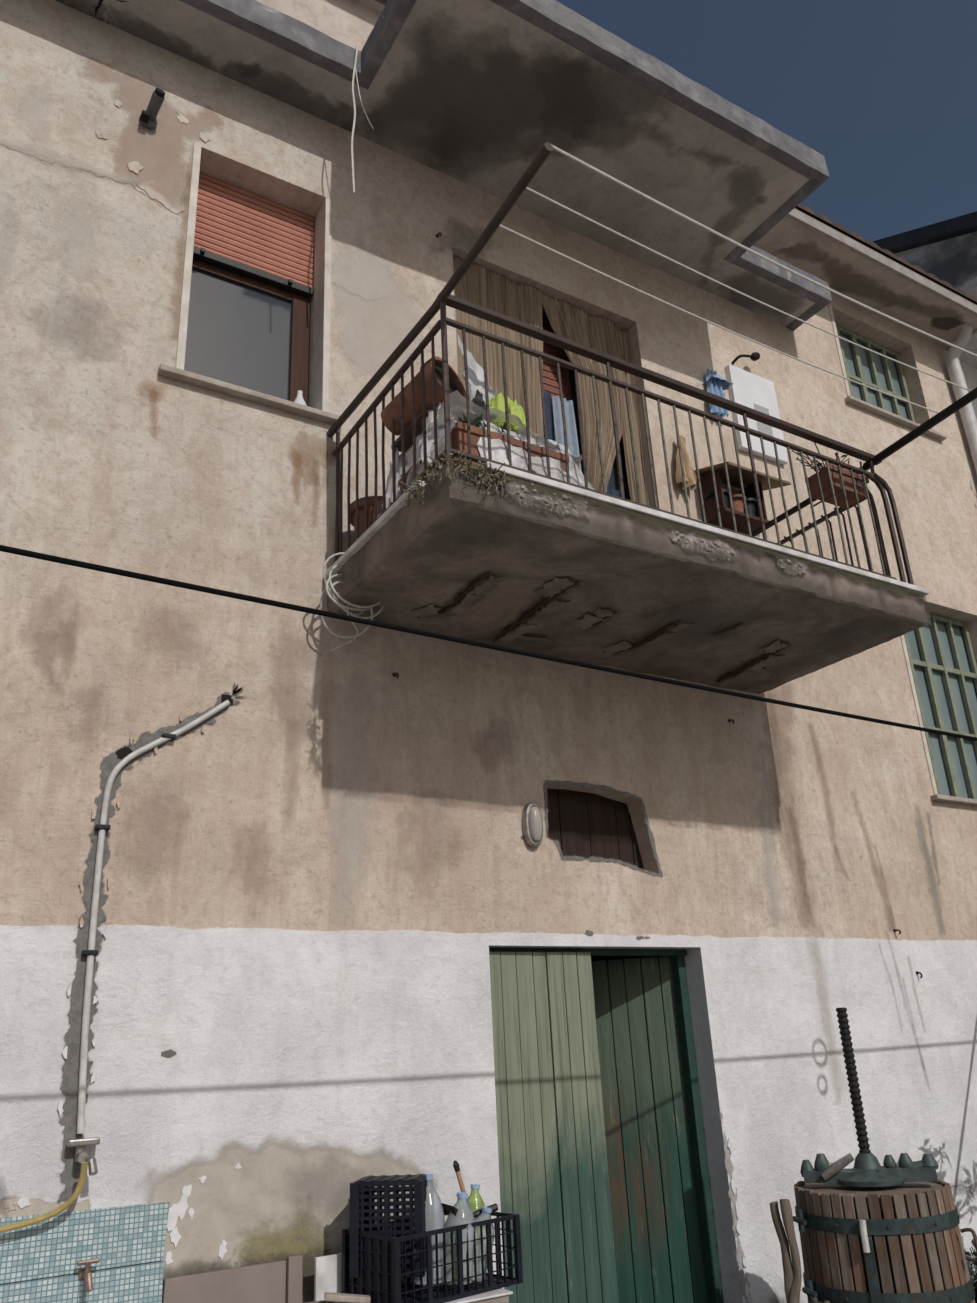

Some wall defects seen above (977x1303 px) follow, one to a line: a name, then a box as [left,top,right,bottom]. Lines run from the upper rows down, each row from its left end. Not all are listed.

leakage [535,0,623,43]
peeling [93,67,220,204]
leakage [783,245,965,330]
leakage [911,233,977,287]
spalling [670,531,737,561]
peeling [148,1140,420,1302]